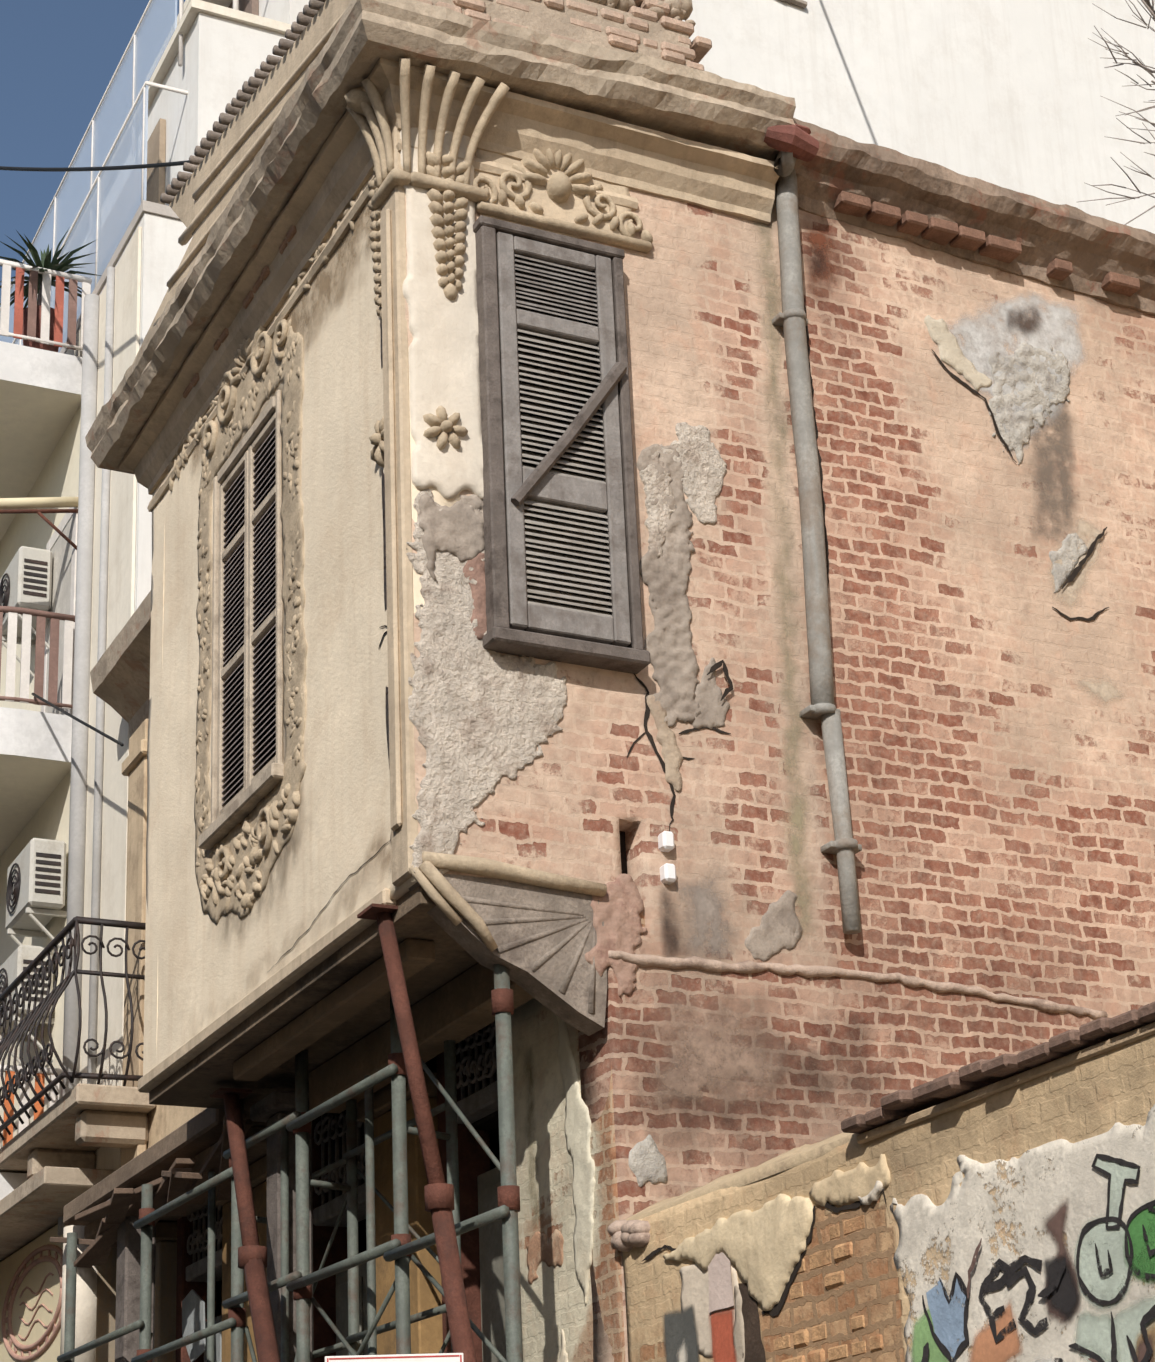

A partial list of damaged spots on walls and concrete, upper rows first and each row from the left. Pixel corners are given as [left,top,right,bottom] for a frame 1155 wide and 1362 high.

flaking render [1046,258,1073,281]
spalling [924,295,1082,465]
flaking render [639,422,727,558]
damp [1033,403,1073,532]
flaking render [406,488,567,876]
crack [627,673,695,831]
spalling [679,657,734,734]
flaking render [526,1016,595,1304]
peeling [663,1104,1155,1362]
flaking render [556,1329,568,1362]